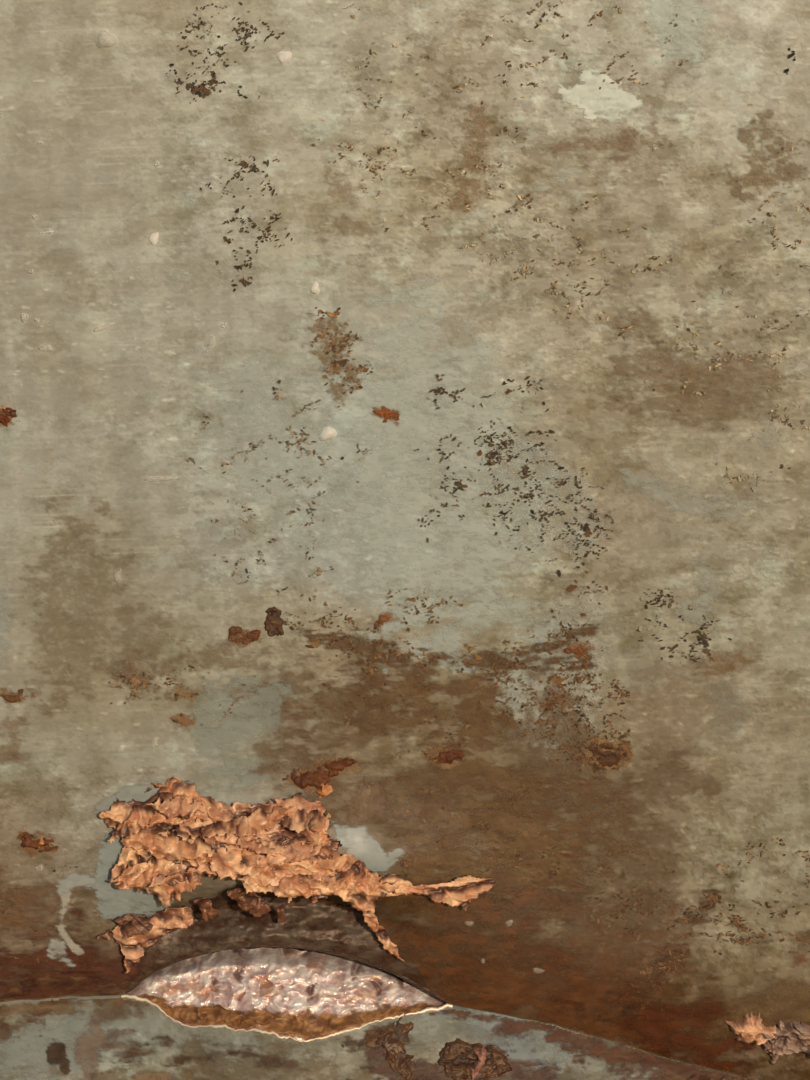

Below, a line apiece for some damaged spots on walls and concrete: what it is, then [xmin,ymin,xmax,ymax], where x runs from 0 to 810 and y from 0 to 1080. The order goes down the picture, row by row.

rust [460,194,620,319]
rust [0,302,810,1080]
peeling [47,834,174,967]
peeling [93,781,167,814]
peeling [333,824,405,872]